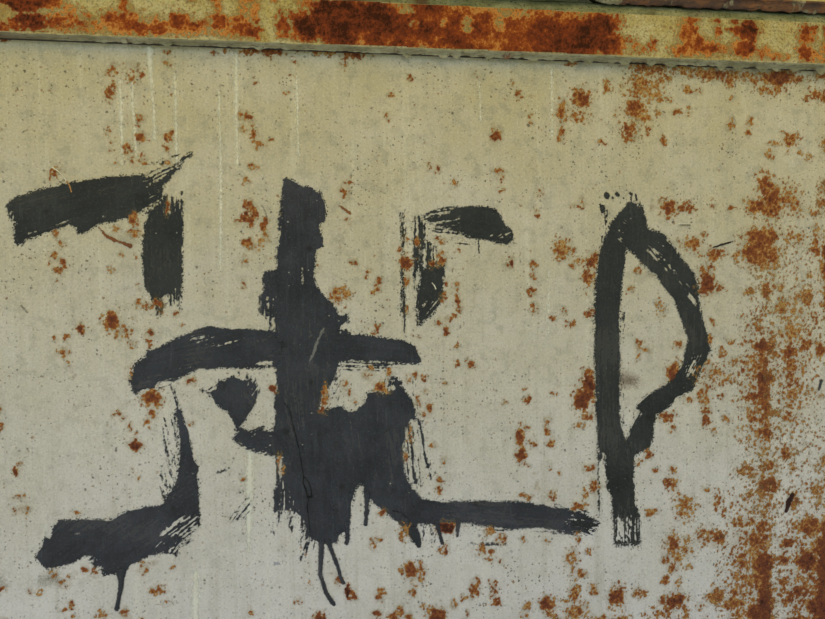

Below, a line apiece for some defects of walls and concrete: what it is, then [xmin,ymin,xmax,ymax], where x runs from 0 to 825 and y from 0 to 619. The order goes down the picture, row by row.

rust [0,0,825,144]
rust [105,114,150,165]
rust [764,130,813,162]
rust [234,199,270,263]
rust [99,307,154,349]
rust [437,282,461,336]
rust [514,169,825,619]
rust [112,388,166,453]
rust [331,573,357,601]
rust [372,588,413,619]
rust [398,559,427,597]
rust [420,577,502,619]